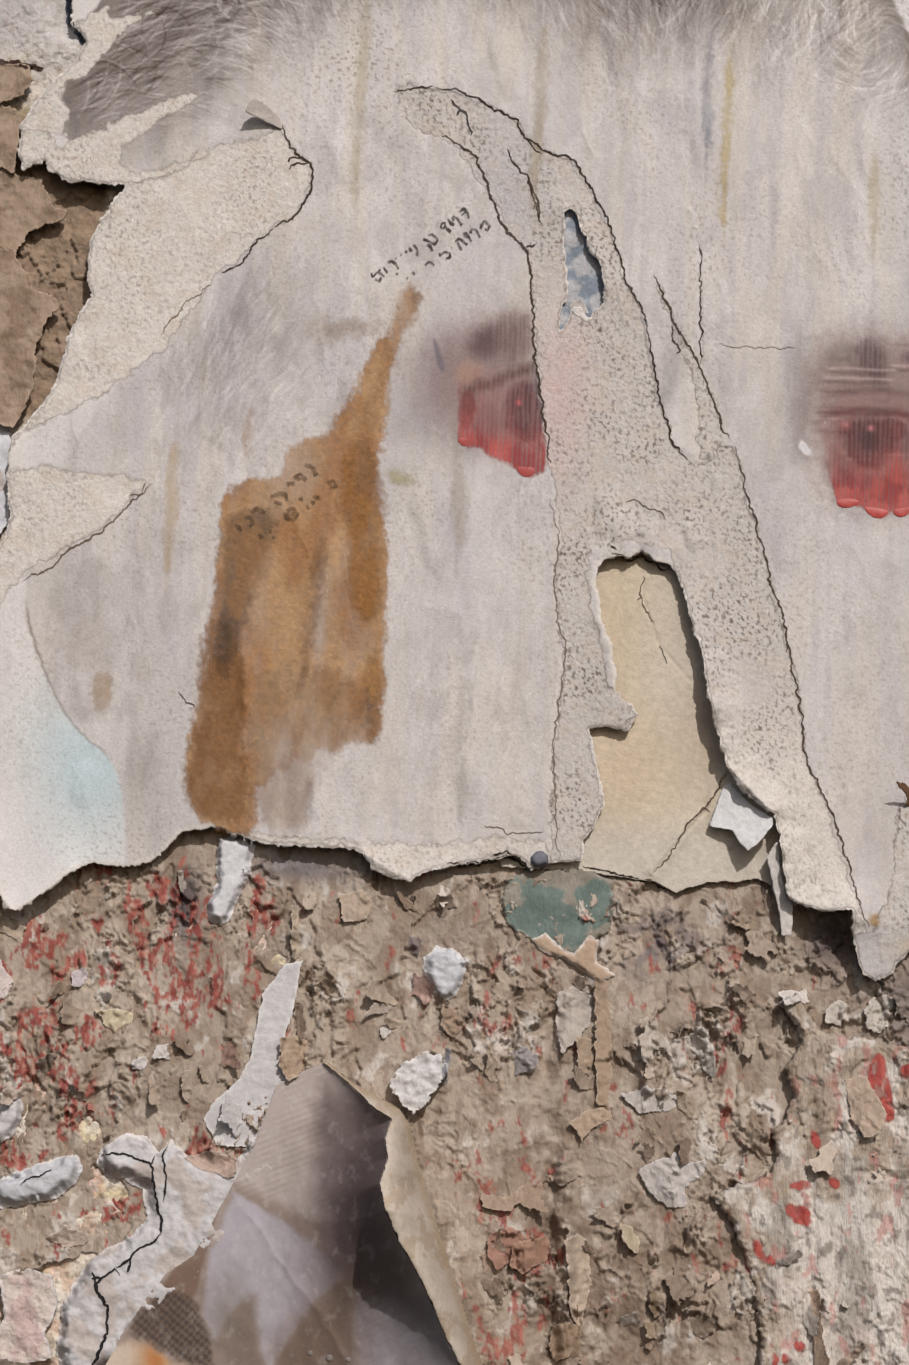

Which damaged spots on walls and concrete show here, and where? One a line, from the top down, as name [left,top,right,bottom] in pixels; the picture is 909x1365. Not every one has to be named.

crack [161,125,314,335]
peeling [0,464,139,603]
peeling [236,83,909,979]
crack [397,86,869,925]
peeling [364,972,465,1085]
peeling [555,975,717,1142]
peeling [778,989,809,1006]
peeling [864,989,909,1034]
peeling [808,1140,837,1175]
peeling [481,1226,610,1365]
peeling [618,1134,721,1365]
peeling [802,1289,869,1365]